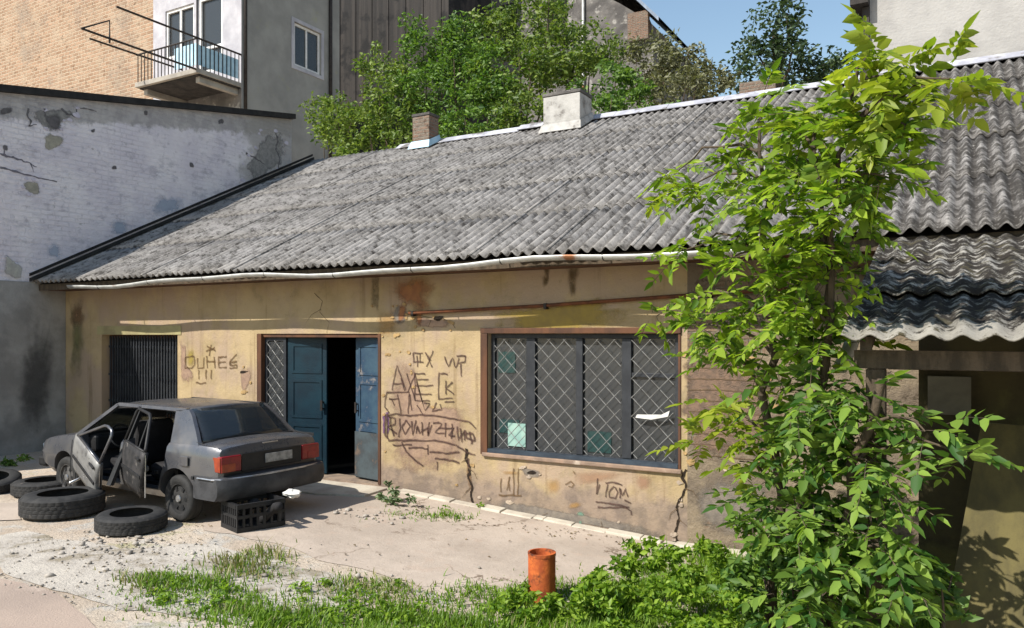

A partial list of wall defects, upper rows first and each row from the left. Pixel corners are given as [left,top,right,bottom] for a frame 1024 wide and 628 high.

spalling [27,106,97,150]
crack [0,146,57,182]
peeling [21,177,45,196]
peeling [240,129,288,183]
corrosion [398,280,428,324]
water stain [25,350,49,414]
crack [462,448,477,503]
crack [669,469,697,541]